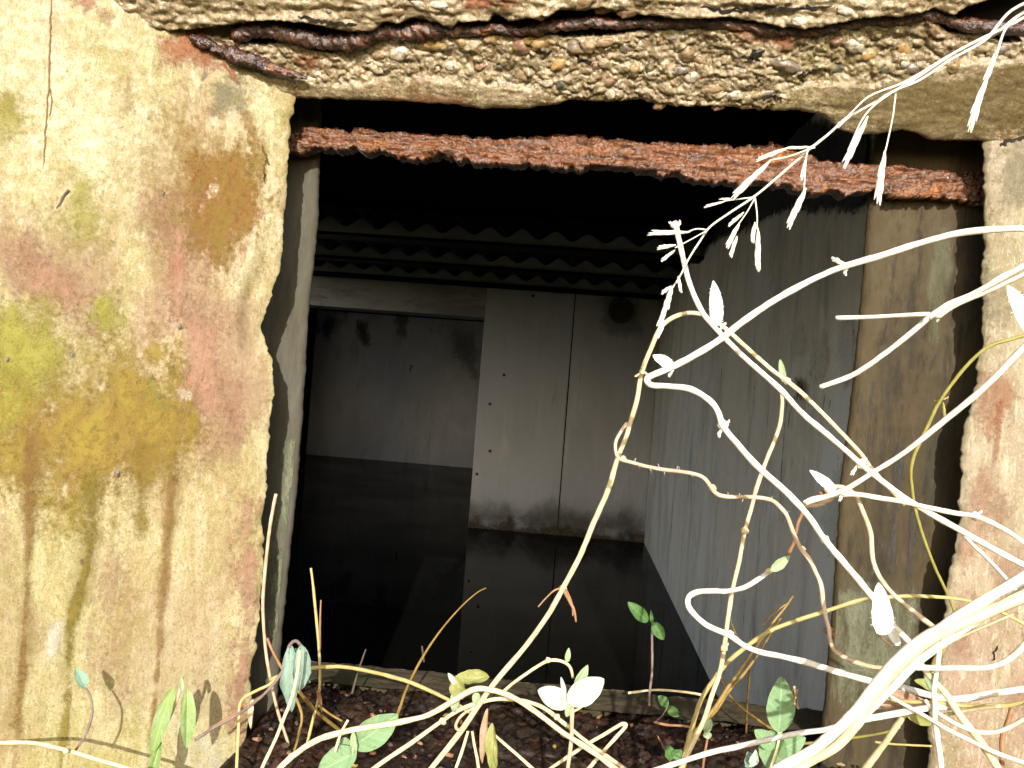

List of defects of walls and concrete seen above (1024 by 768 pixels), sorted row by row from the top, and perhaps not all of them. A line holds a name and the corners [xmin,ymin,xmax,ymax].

rust [465,0,516,12]
spalling [791,17,808,26]
spalling [837,0,866,19]
crack [43,0,52,166]
rust [158,28,318,85]
spalling [349,38,444,75]
spalling [473,36,655,100]
spalling [668,36,775,111]
damp [135,506,146,530]
damp [47,482,96,666]
damp [154,477,175,683]
damp [14,638,26,732]